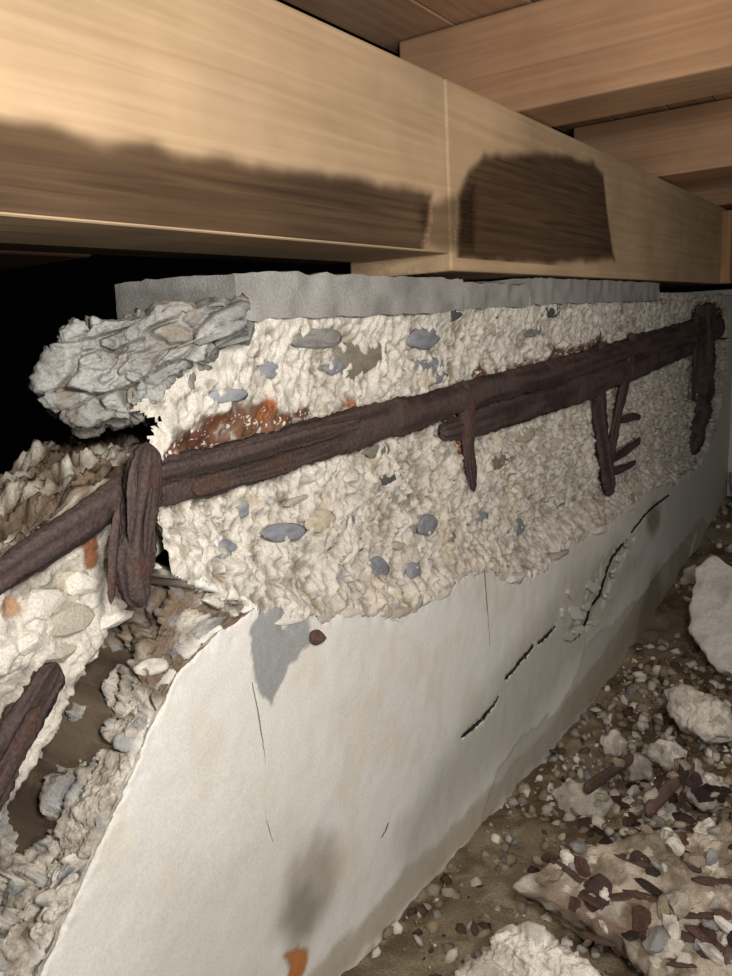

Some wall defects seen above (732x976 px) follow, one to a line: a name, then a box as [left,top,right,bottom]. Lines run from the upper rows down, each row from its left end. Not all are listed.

damp [0,122,431,249]
damp [458,154,614,264]
rust [471,365,501,379]
rust [546,333,607,361]
rust [164,399,309,457]
rust [81,535,98,569]
rust [3,597,19,617]
spalling [0,293,730,976]
crack [461,495,670,738]
damp [313,521,708,976]
rust [285,949,308,976]